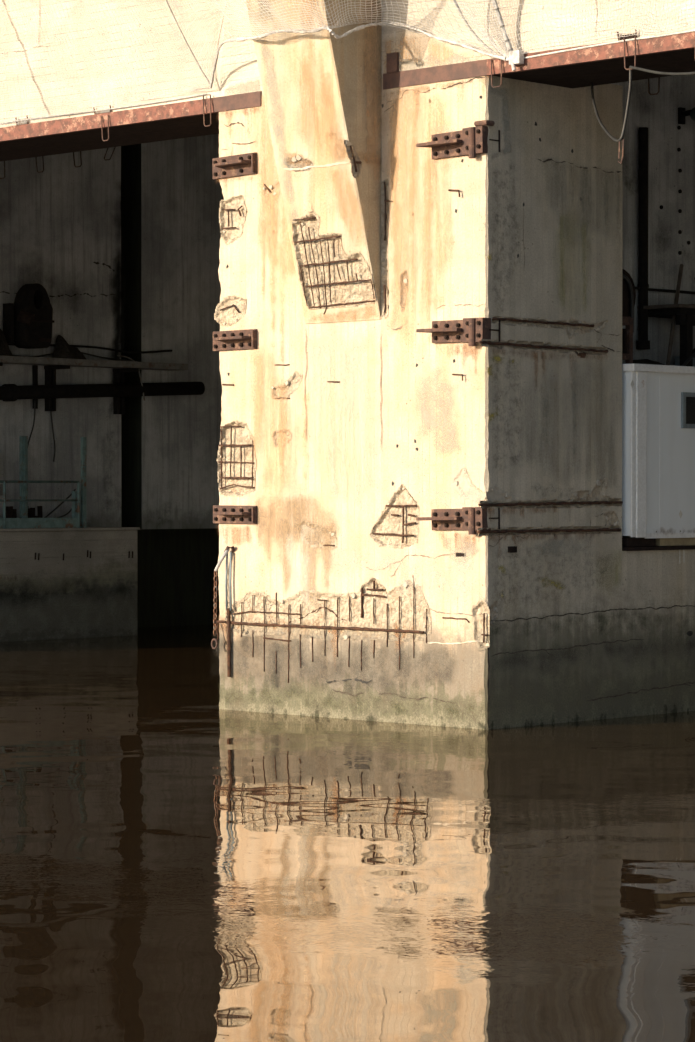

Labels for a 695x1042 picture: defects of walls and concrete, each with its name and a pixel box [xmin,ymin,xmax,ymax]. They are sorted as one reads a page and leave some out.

spalling [284,154,313,172]
spalling [219,195,247,245]
spalling [292,180,408,319]
leakage [110,251,125,381]
spalling [214,295,246,326]
spalling [217,420,256,496]
spalling [272,429,292,447]
spalling [369,484,419,549]
spalling [215,575,491,683]